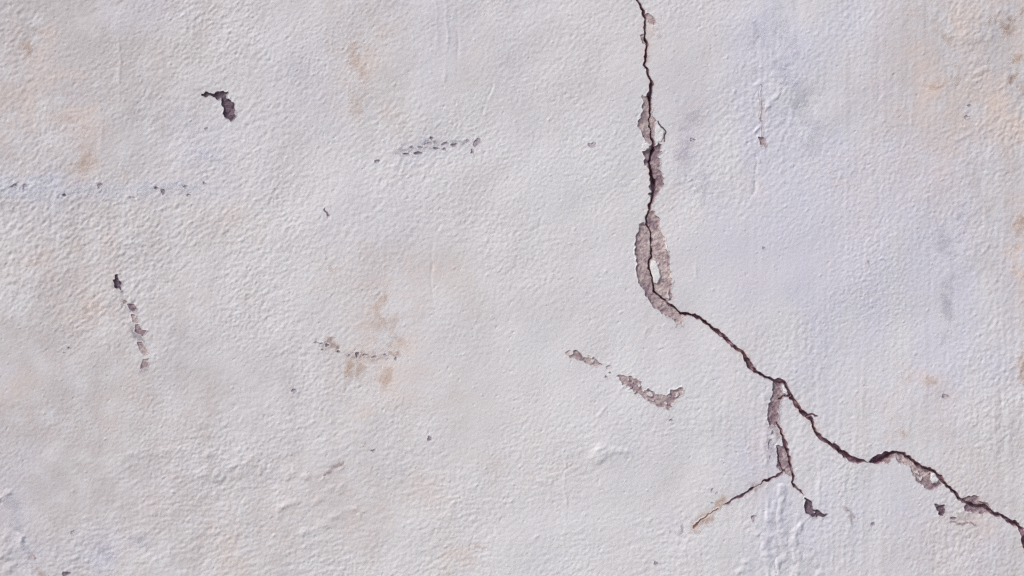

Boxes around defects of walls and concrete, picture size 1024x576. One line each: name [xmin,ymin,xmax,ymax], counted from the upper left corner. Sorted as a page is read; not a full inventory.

peeling [201,91,236,121]
spalling [634,95,685,325]
peeling [113,274,149,369]
crack [636,0,1024,548]
peeling [565,350,683,422]